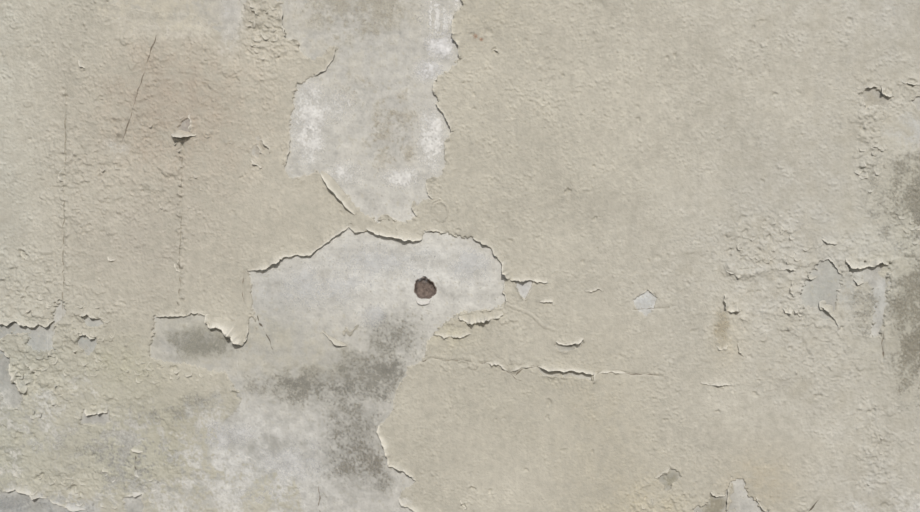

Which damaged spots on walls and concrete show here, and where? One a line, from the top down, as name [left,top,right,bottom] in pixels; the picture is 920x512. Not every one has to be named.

peeling [860,83,893,122]
peeling [0,300,66,411]
peeling [78,308,104,355]
peeling [150,0,554,512]
peeling [778,255,893,337]
water stain [892,265,920,384]
peeling [78,406,110,428]
peeling [693,477,779,512]